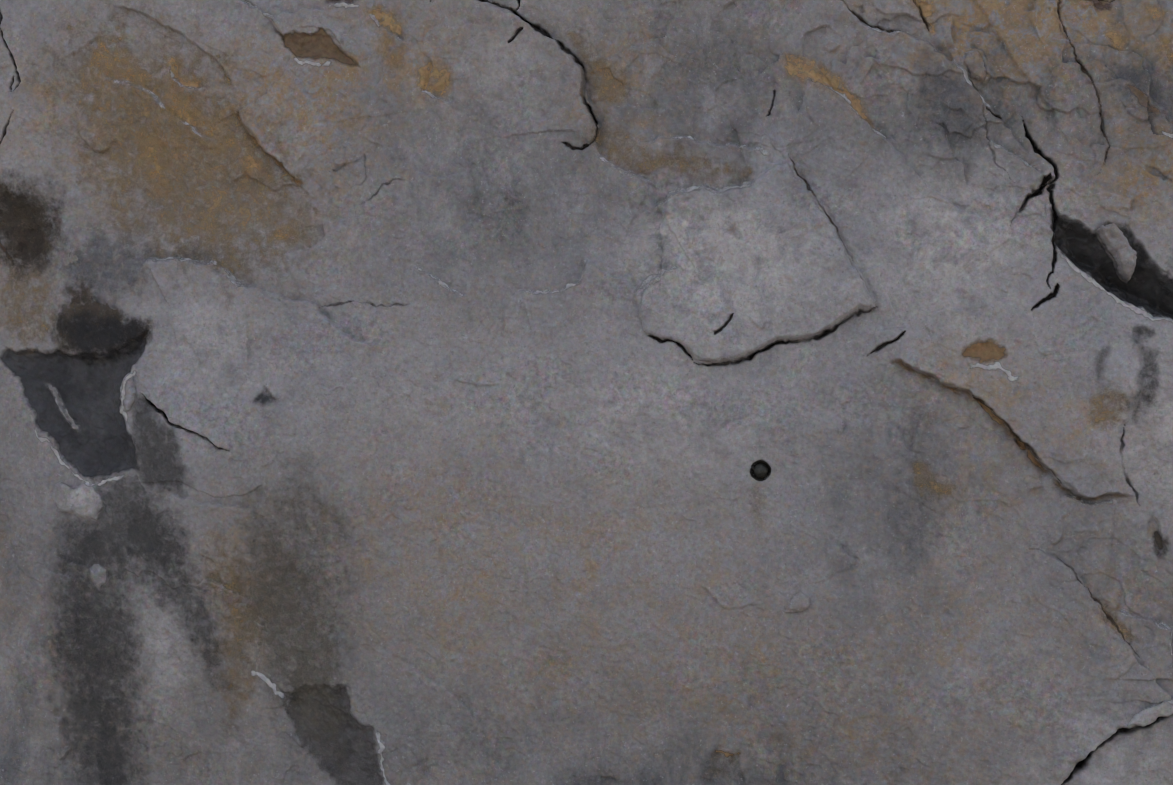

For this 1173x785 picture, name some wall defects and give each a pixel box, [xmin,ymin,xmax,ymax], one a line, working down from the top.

crack [481,0,584,68]
crack [562,103,598,150]
corrosion [785,54,874,128]
leakage [0,183,60,278]
crack [990,111,1059,310]
spalling [1051,209,1173,323]
crack [648,307,875,366]
spalling [1,339,146,520]
crack [146,398,222,449]
leakage [56,399,218,785]
spalling [251,670,391,785]
crack [1065,717,1163,780]